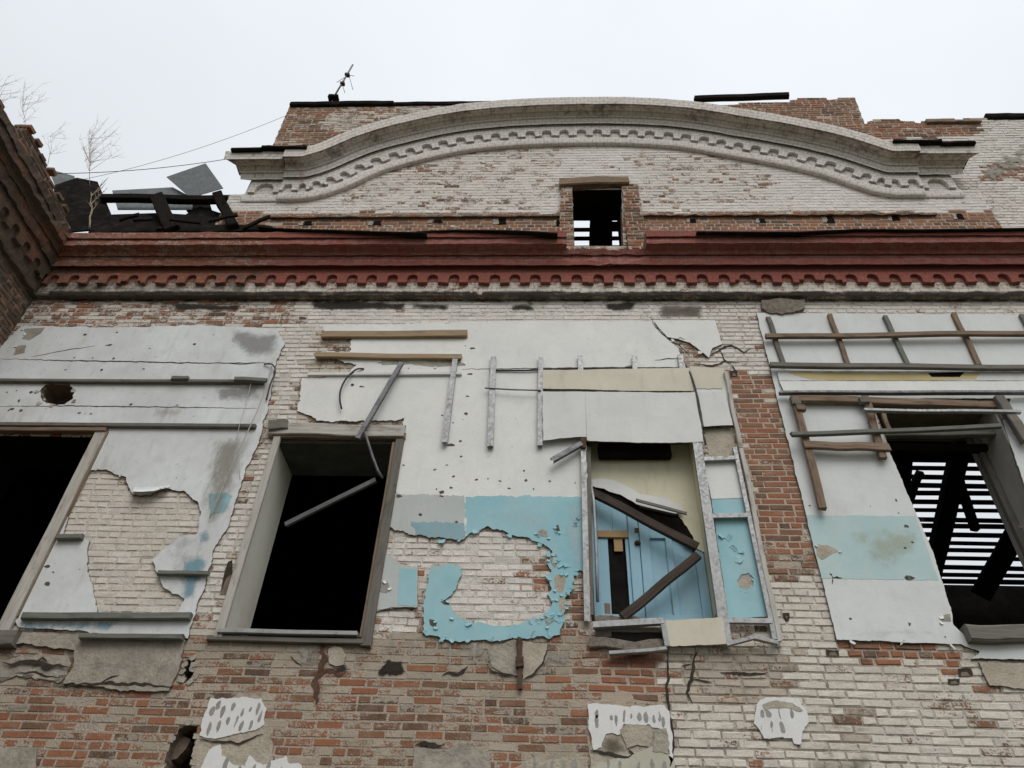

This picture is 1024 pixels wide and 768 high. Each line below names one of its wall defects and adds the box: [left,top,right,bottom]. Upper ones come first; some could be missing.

crack [499,321,752,371]
flaking render [670,339,706,366]
spalling [6,384,92,414]
flaking render [65,468,200,612]
spalling [220,560,232,595]
flaking render [375,516,591,643]
spalling [178,654,199,685]
crack [290,645,345,704]
flaking render [158,697,303,768]
crack [664,650,768,759]